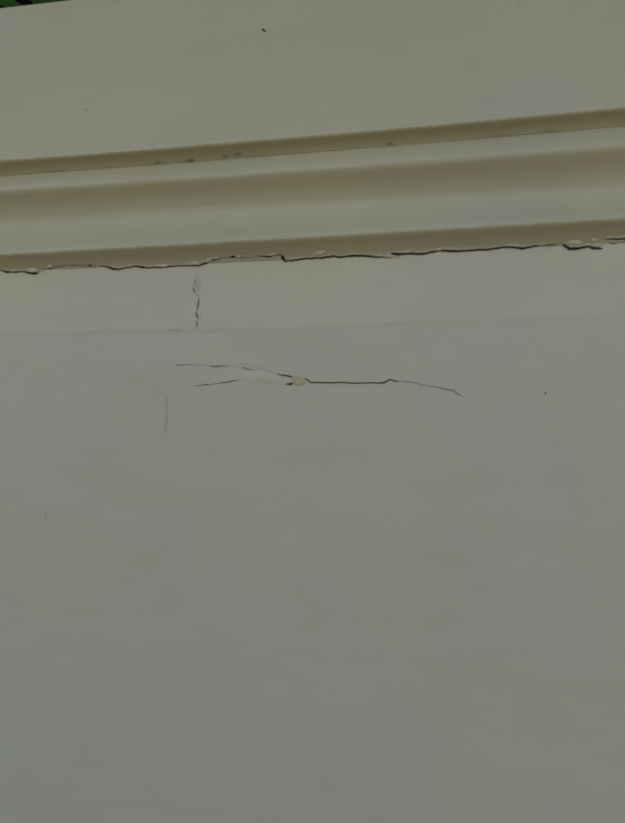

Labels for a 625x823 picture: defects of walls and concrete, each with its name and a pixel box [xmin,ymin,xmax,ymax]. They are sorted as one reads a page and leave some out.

crack [0,234,625,331]
crack [177,363,462,397]